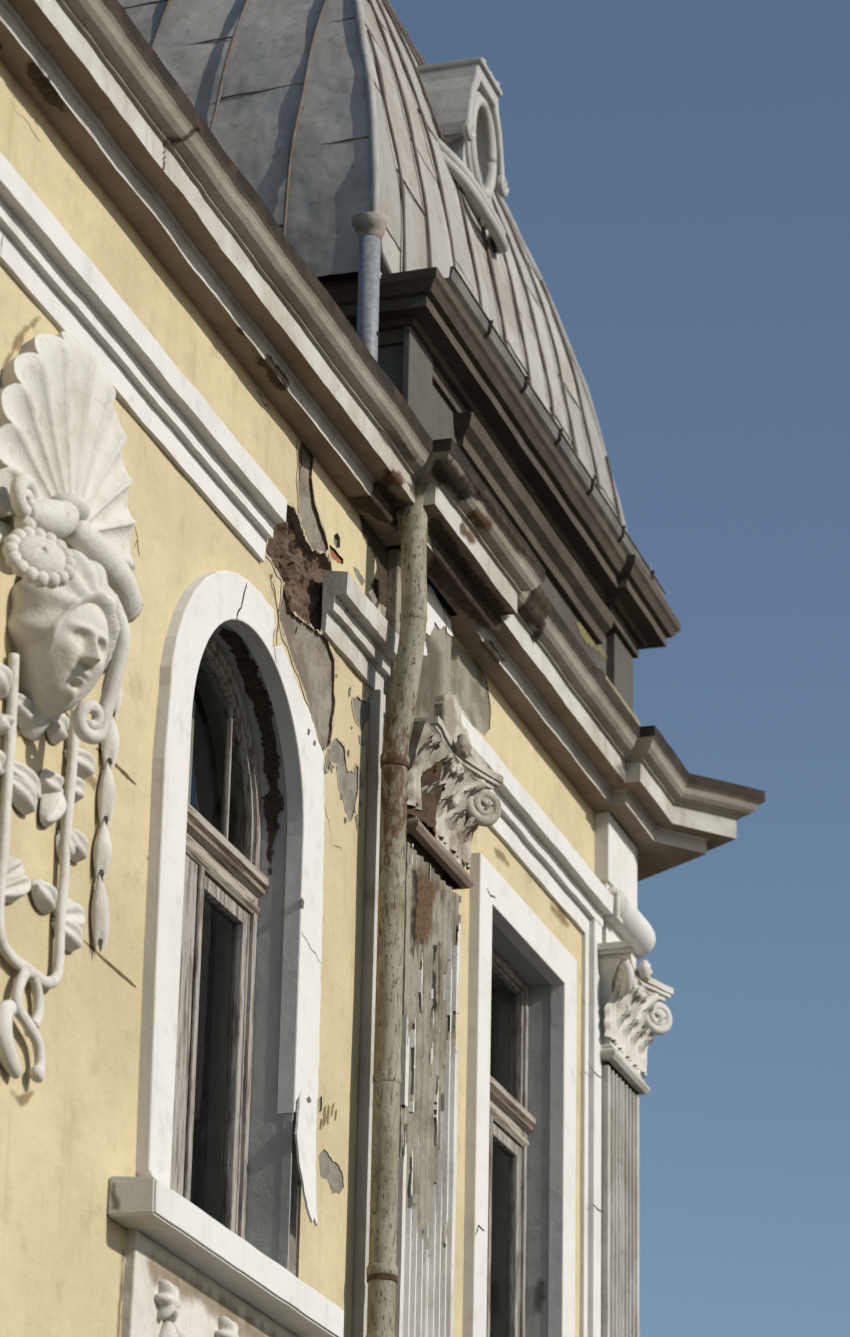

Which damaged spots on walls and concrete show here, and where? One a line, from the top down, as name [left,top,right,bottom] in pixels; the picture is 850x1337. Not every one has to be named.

peeling [219,629,285,875]
crack [237,573,284,663]
flaking render [265,438,387,830]
flaking render [423,584,491,736]
corrosion [415,860,447,1013]
peeling [399,842,459,1271]
peeling [278,1082,344,1278]